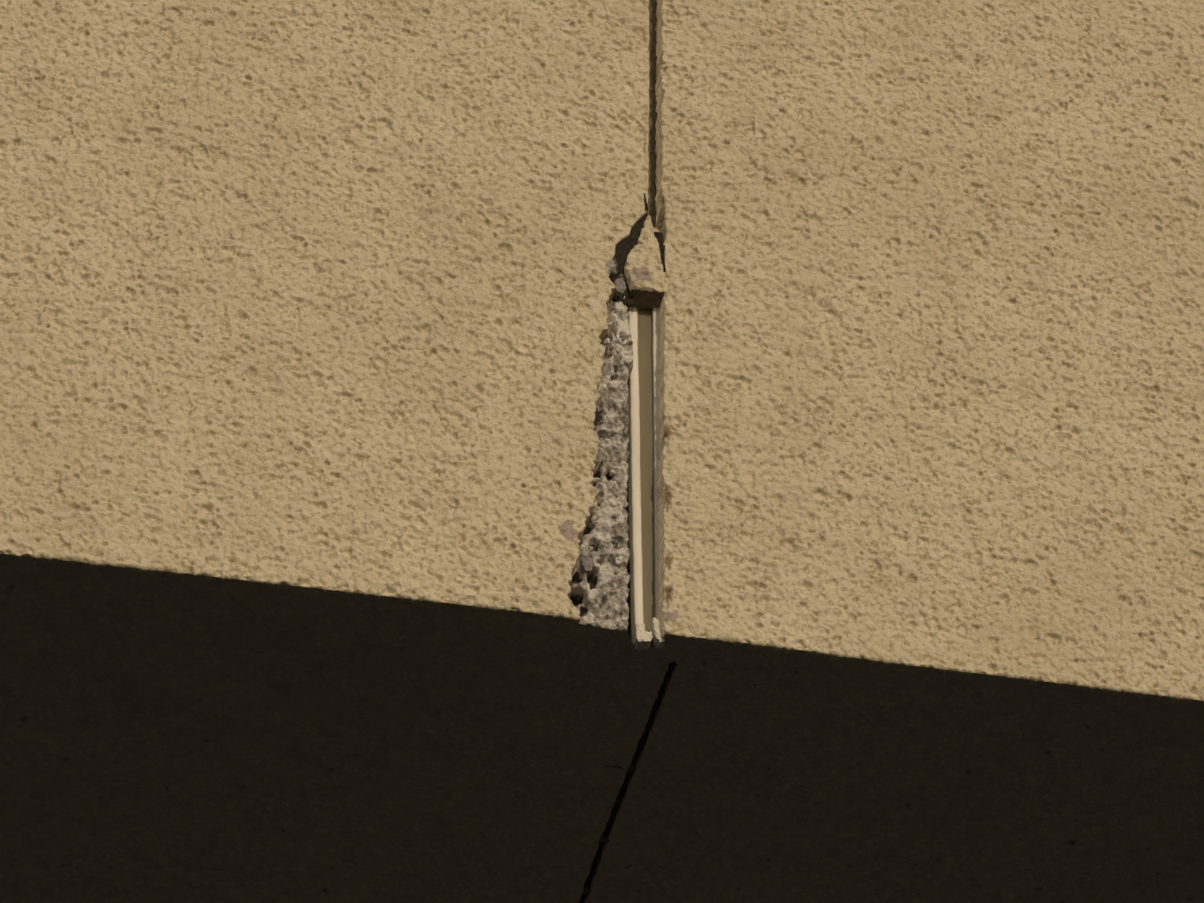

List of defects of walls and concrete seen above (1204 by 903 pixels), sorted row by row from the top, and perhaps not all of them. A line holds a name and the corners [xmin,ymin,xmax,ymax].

crack [609,193,666,304]
spalling [569,274,634,632]
crack [624,433,632,639]